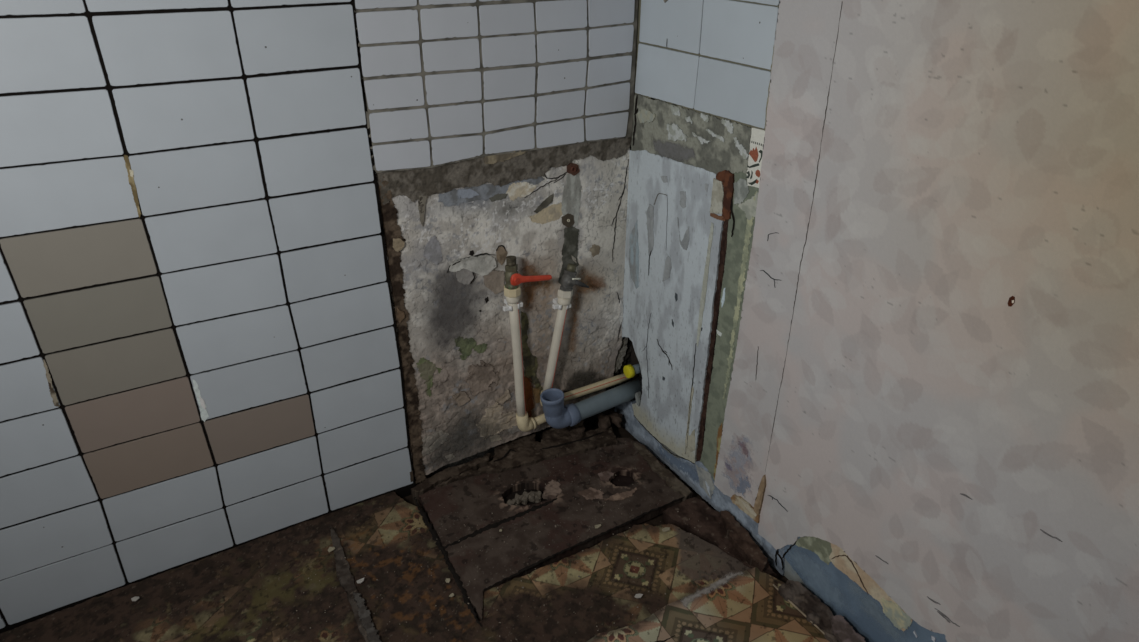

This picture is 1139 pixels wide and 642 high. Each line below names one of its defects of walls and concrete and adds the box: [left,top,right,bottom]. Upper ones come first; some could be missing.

damp [432,271,471,344]
crack [612,95,638,261]
peeling [376,93,947,642]
rust [696,170,735,461]